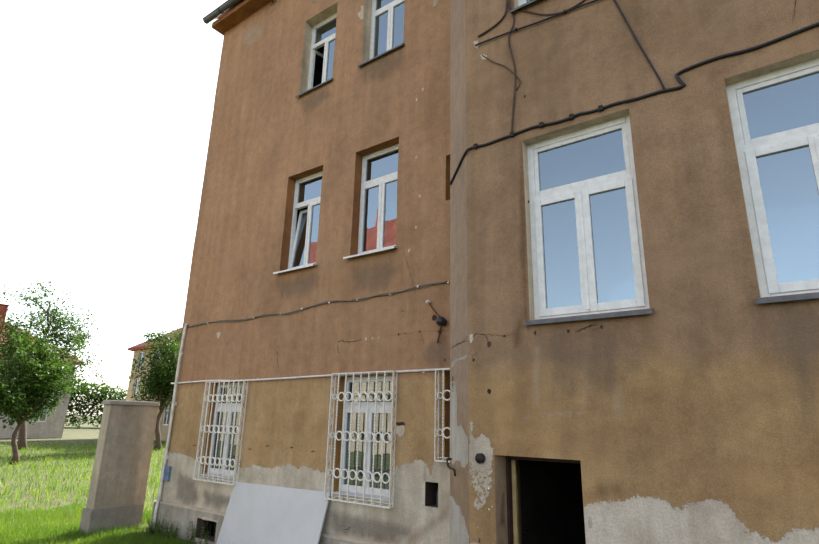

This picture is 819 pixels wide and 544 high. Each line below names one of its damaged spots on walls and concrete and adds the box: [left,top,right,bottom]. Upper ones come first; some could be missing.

peeling [158,380,493,544]
peeling [584,494,819,544]